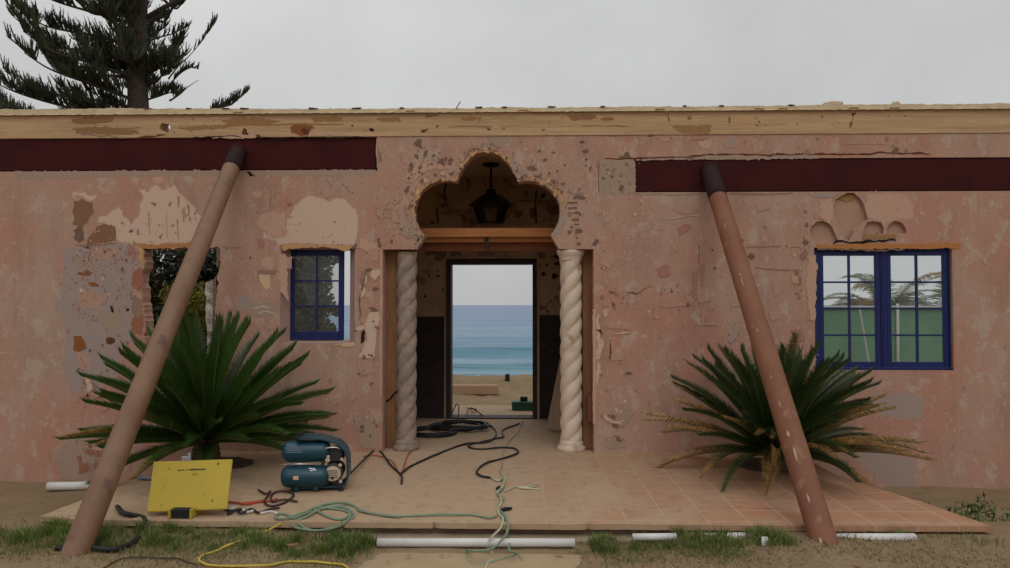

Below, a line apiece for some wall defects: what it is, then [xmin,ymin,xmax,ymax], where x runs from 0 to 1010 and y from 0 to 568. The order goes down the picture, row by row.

peeling [85,176,201,335]
peeling [241,195,393,270]
peeling [360,268,380,297]
peeling [400,129,599,249]
spalling [579,140,636,195]
crack [590,135,929,194]
peeling [865,193,913,227]
peeling [354,307,380,360]
peeling [76,337,115,412]
peeling [55,438,103,481]